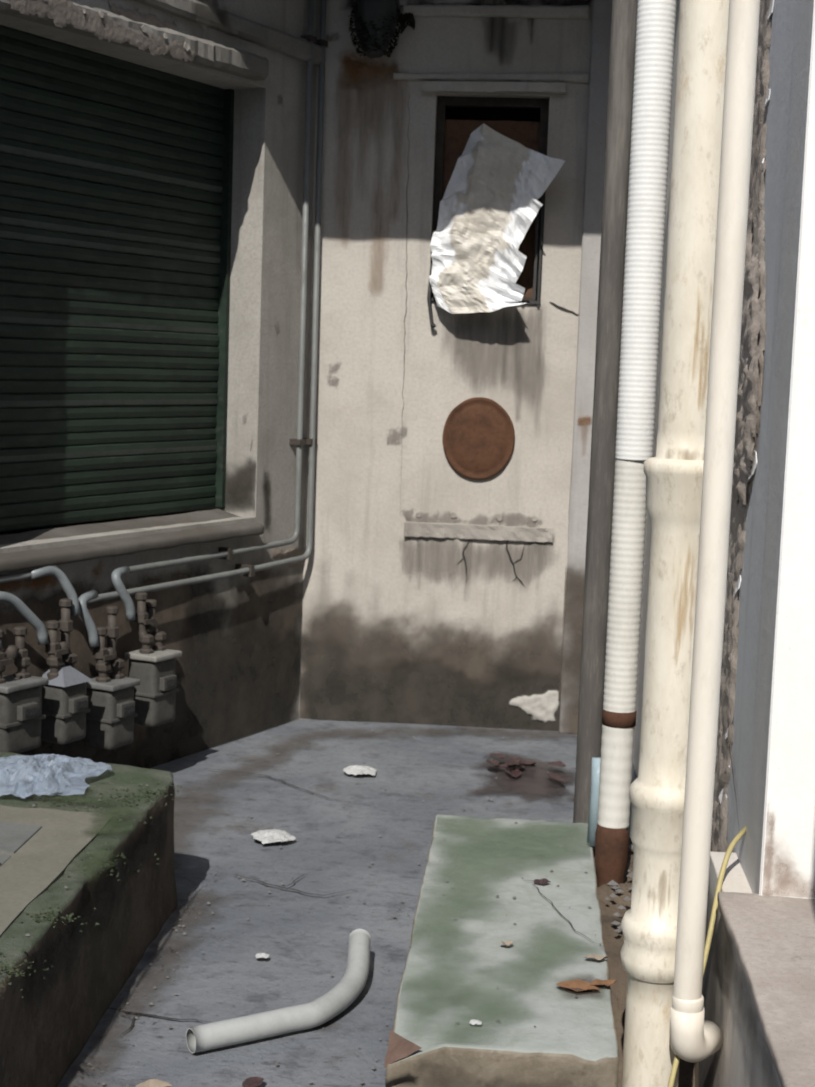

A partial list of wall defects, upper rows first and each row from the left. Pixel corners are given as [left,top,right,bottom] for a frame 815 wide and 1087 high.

flaking render [8,0,195,62]
damp [469,0,590,55]
rust [342,54,397,89]
damp [456,319,537,392]
spalling [710,0,774,852]
damp [217,461,269,525]
spalling [405,511,537,527]
crack [459,540,470,582]
crack [506,541,525,585]
damp [18,569,585,769]
damp [764,819,815,896]
crack [526,880,619,967]